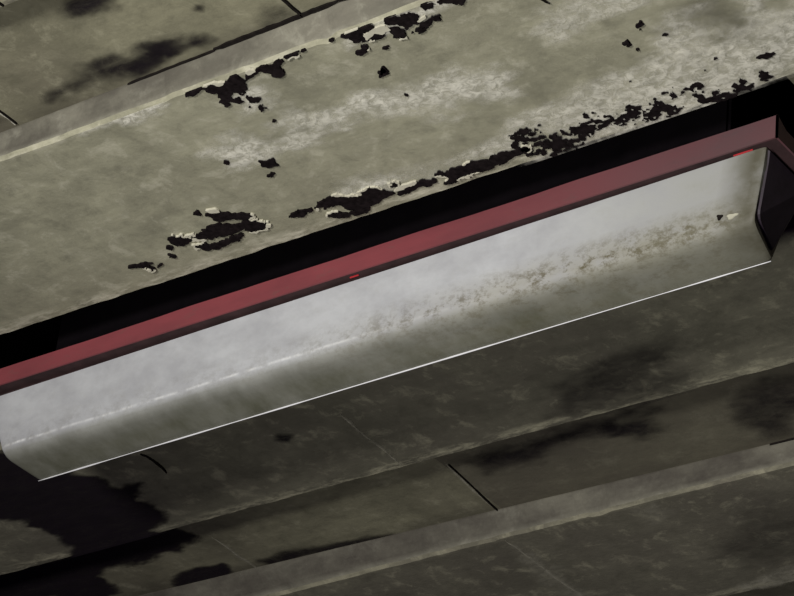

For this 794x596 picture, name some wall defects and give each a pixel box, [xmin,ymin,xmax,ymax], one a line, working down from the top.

crack [127,0,346,85]
peeling [328,0,465,56]
peeling [185,48,306,112]
crack [0,110,17,125]
peeling [258,157,279,178]
peeling [288,69,773,219]
peeling [128,207,271,273]
leakage [0,453,197,596]
leakage [173,563,231,586]